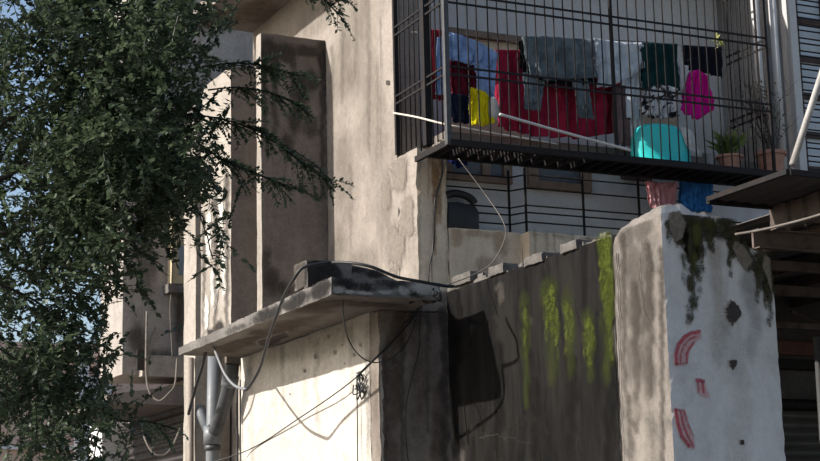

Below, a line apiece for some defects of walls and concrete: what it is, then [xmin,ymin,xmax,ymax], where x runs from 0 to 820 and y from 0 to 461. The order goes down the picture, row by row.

leakage [262,39,326,173]
leakage [681,215,775,326]
spalling [762,255,773,300]
leakage [131,329,145,349]
leakage [175,297,183,343]
leakage [207,223,663,461]
spalling [724,299,742,326]